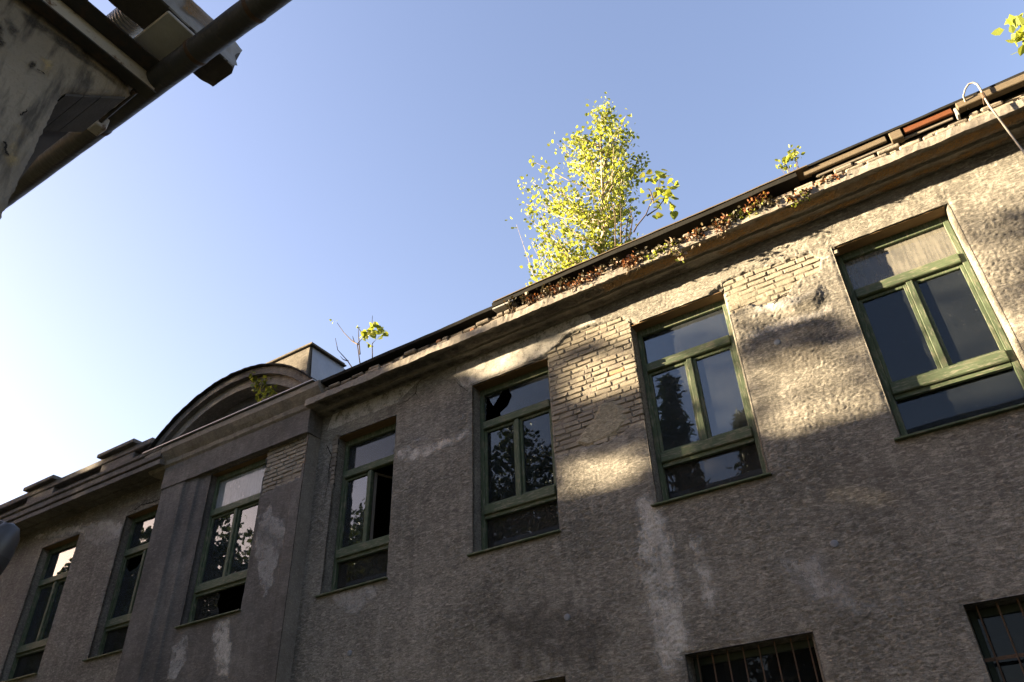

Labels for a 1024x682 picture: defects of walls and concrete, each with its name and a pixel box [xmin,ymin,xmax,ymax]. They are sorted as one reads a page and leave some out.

flaking render [456,314,645,457]
flaking render [261,436,309,495]
damp [637,497,691,672]
damp [689,540,715,608]